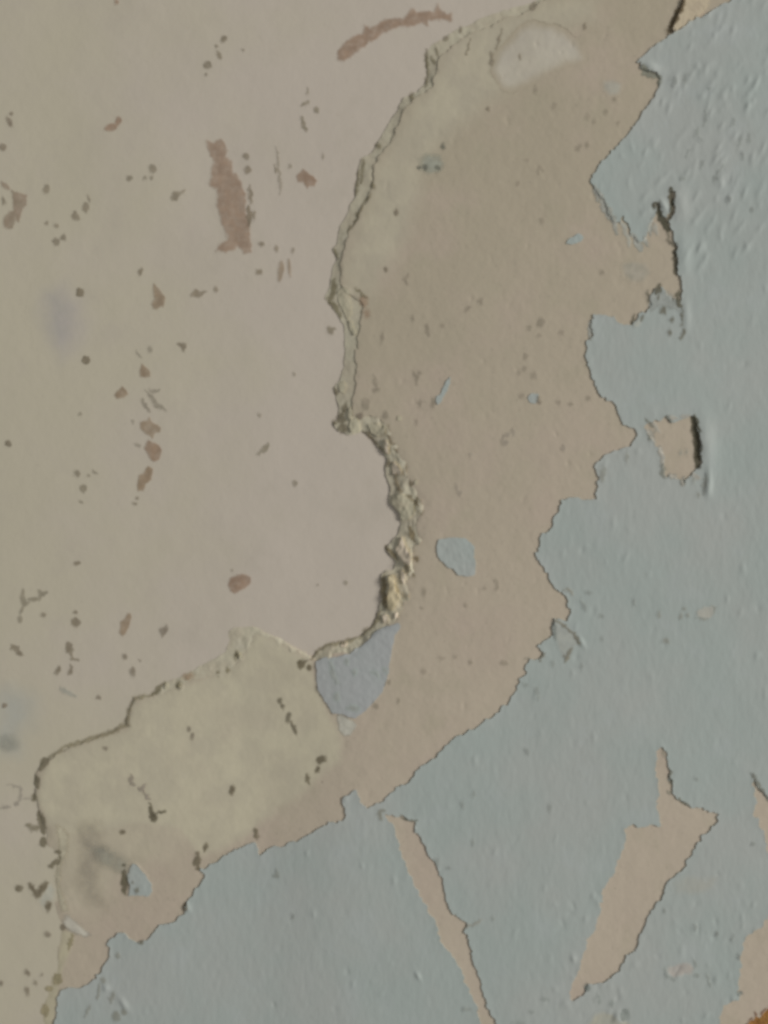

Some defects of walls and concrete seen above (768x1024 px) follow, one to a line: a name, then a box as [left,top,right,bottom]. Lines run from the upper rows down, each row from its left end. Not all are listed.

peeling [59,0,683,995]
peeling [644,416,702,481]
peeling [569,747,719,1001]